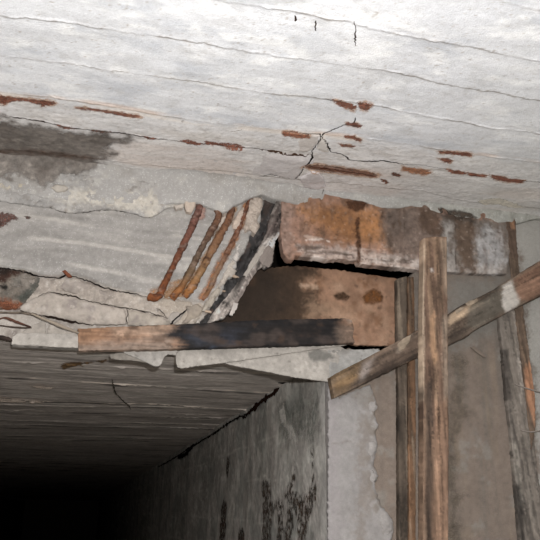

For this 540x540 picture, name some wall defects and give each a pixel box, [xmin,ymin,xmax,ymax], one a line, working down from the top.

rust [0,95,57,107]
rust [332,99,372,111]
damp [0,114,132,186]
flaking render [0,173,196,218]
spalling [232,197,263,237]
crack [243,118,408,179]
rust [301,163,389,184]
rust [439,151,524,183]
rust [147,198,253,302]
spalling [270,238,412,279]
spalling [0,244,240,326]
crack [158,387,280,467]